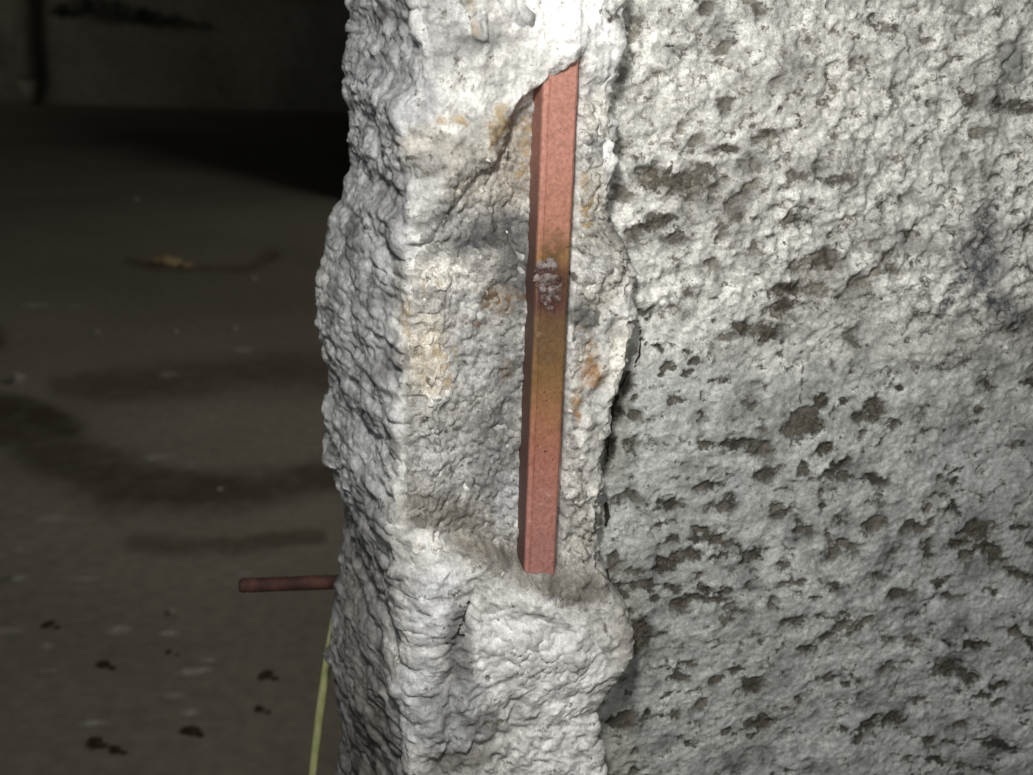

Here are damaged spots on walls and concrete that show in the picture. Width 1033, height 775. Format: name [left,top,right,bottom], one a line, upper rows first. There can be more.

spalling [402,101,534,555]
rust [483,235,566,312]
spalling [559,100,631,570]
crack [604,320,641,465]
crack [603,502,611,527]